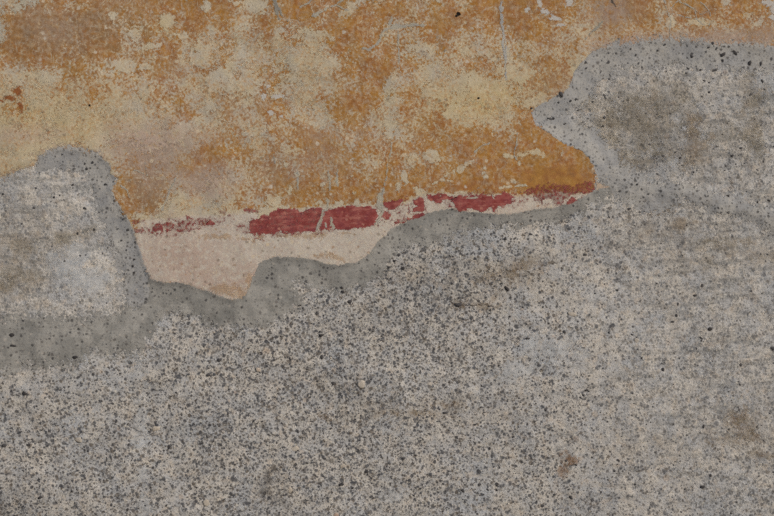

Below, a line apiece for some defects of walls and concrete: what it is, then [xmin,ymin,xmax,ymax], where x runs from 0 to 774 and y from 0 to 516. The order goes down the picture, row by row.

peeling [0,0,40,59]
peeling [228,0,274,15]
crack [499,1,507,80]
spalling [0,13,354,347]
peeling [395,147,443,193]
peeling [379,41,550,143]
peeling [503,148,545,166]
spalling [547,36,774,213]
spalling [0,159,774,516]